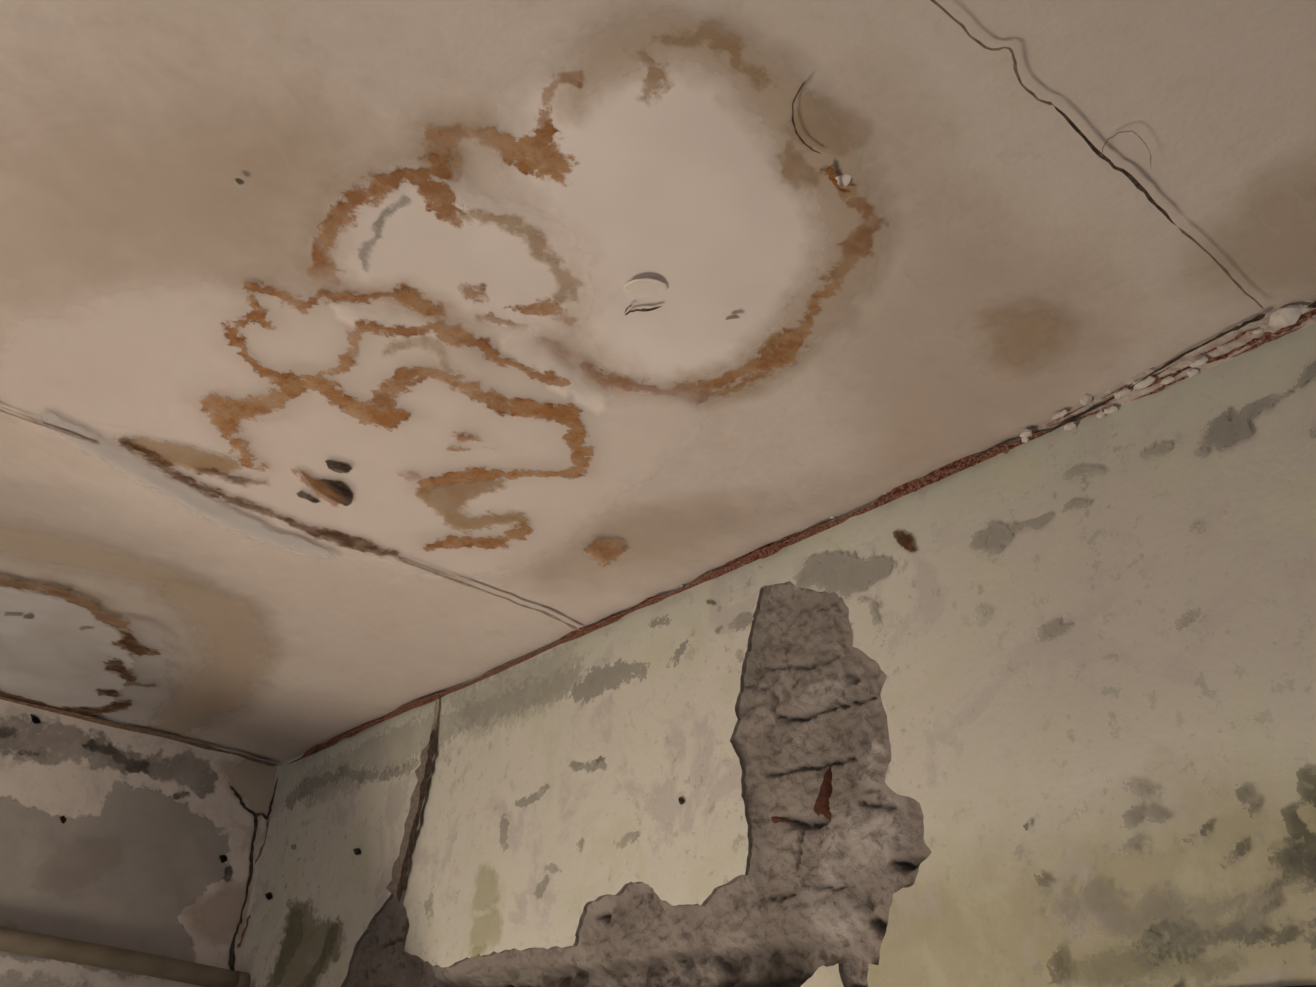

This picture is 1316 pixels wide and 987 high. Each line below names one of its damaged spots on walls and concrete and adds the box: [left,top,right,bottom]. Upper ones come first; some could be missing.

leakage [118,17,880,559]
crack [0,409,99,445]
peeling [292,460,353,506]
crack [290,0,1316,902]
leakage [0,577,161,715]
peeling [0,714,233,962]
crack [0,696,280,971]
flaking render [346,550,932,987]
peeling [1119,782,1169,860]
peeling [1268,768,1316,884]
peeling [1132,917,1316,969]